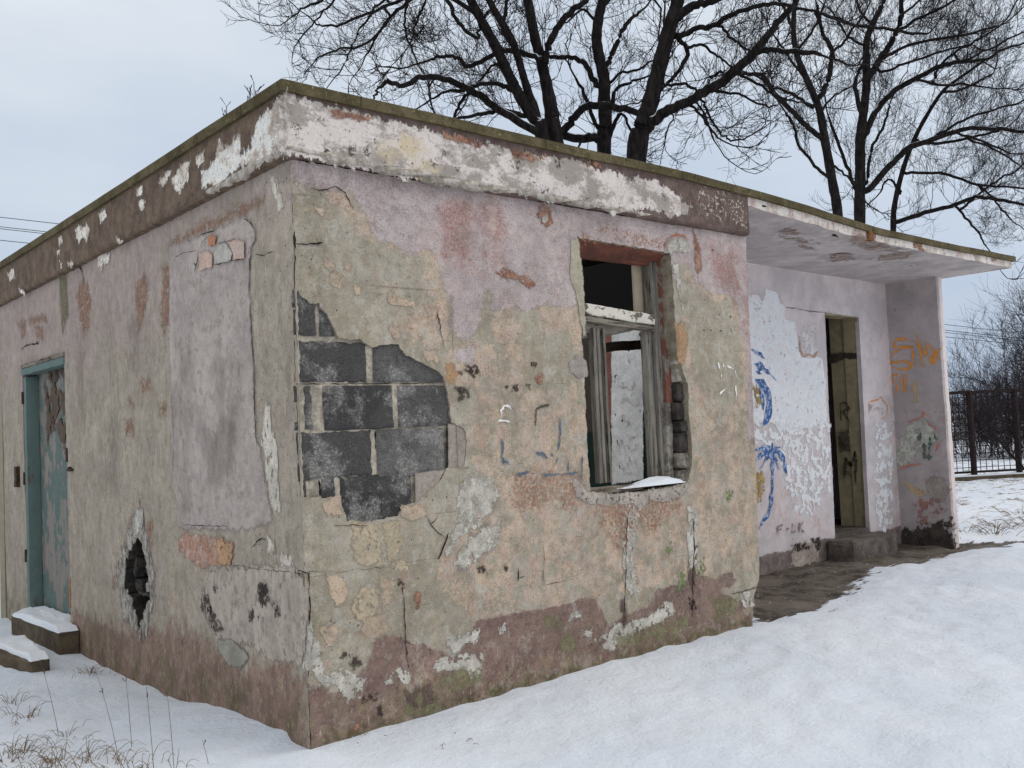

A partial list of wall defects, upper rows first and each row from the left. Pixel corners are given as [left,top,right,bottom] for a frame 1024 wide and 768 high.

peeling [158,149,205,194]
peeling [136,184,146,211]
peeling [75,208,107,245]
peeling [97,237,123,271]
peeling [778,225,922,266]
spalling [291,280,503,638]
spalling [115,508,156,642]
crack [692,520,701,616]
crack [233,538,412,667]
peeling [567,601,675,652]
water stain [404,684,434,707]